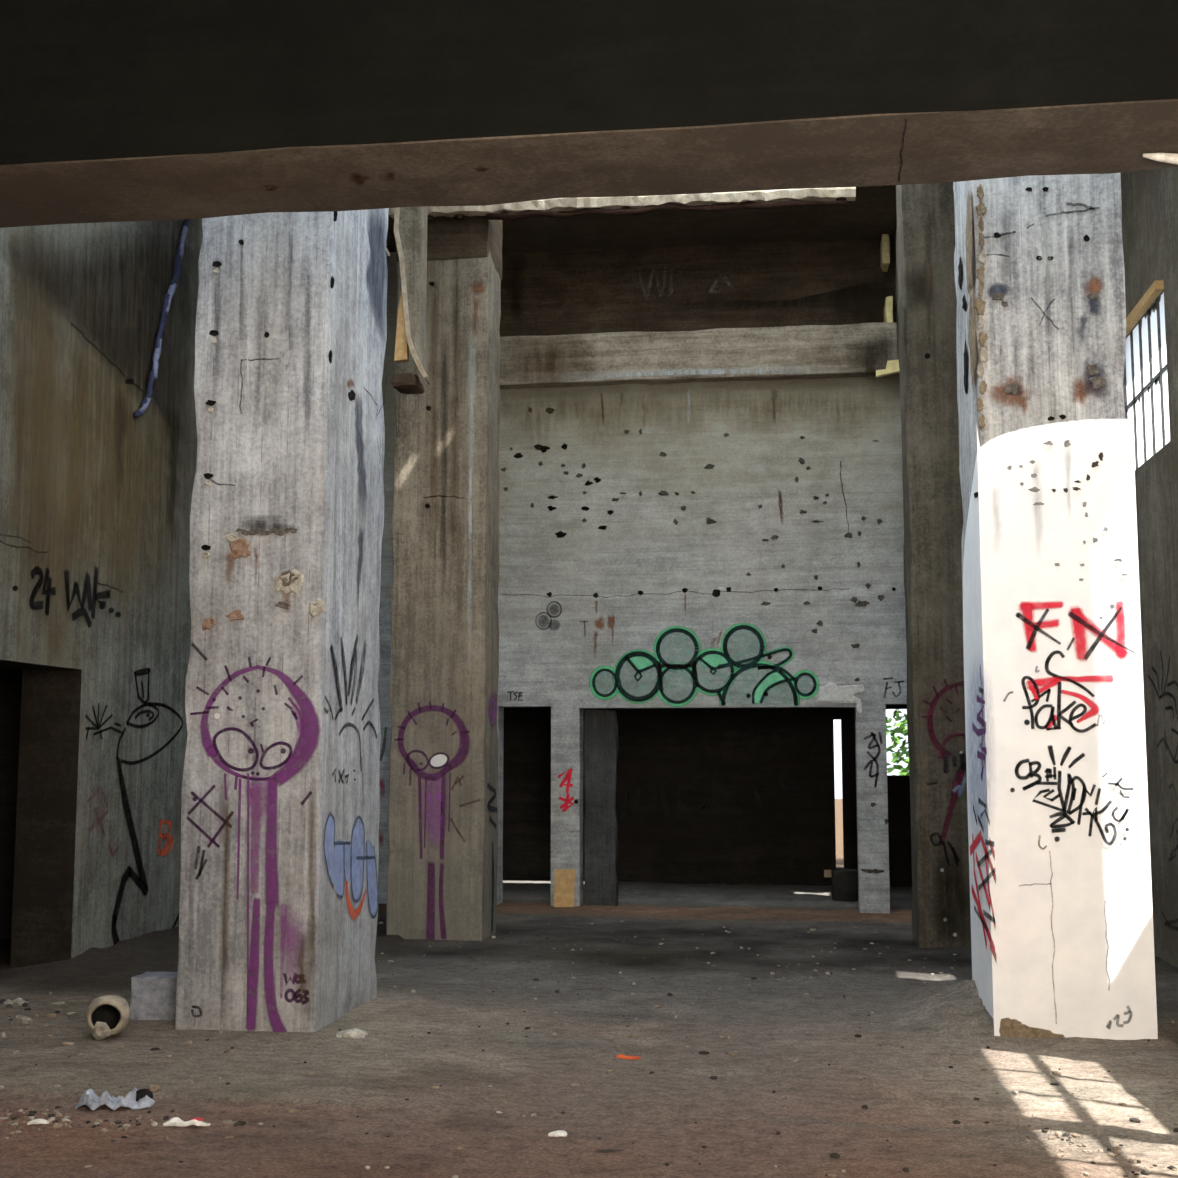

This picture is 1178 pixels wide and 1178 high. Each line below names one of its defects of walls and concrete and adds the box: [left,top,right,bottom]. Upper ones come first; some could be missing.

crack [898,119,907,182]
damp [33,240,177,406]
corrosion [1080,277,1102,340]
corrosion [994,379,1026,410]
corrosion [1074,364,1107,402]
spalling [224,518,298,575]
spalling [273,569,304,610]
spalling [202,609,244,631]
peeling [999,1018,1065,1038]